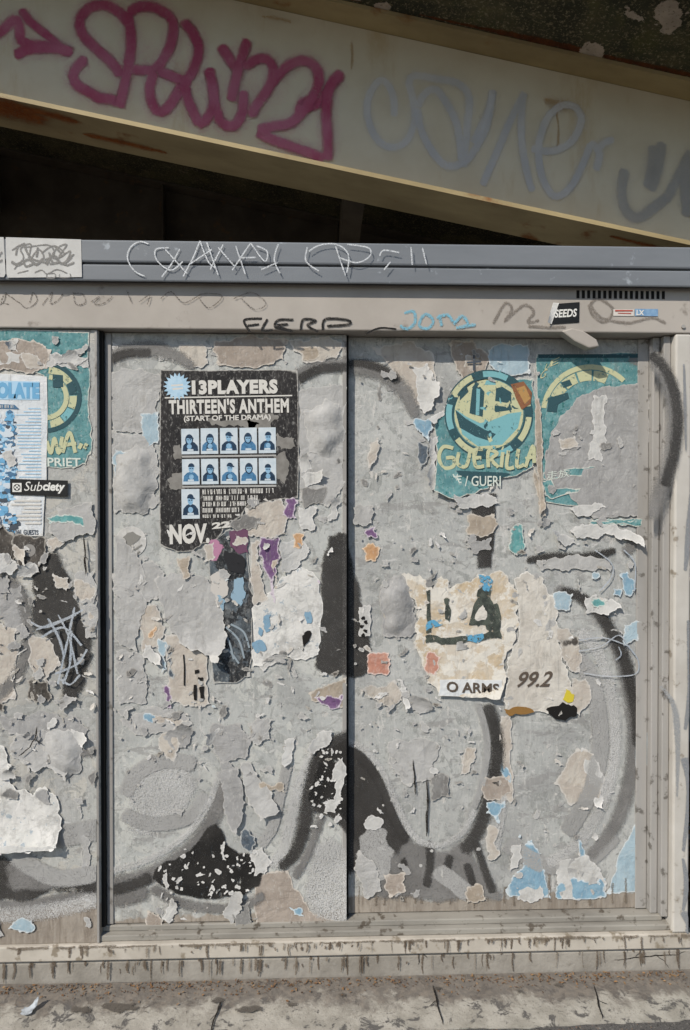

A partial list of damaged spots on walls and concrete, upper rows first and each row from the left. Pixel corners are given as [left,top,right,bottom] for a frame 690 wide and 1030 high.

spalling [624,0,689,35]
peeling [111,334,343,509]
peeling [224,383,402,630]
peeling [360,341,447,491]
peeling [448,340,540,384]
peeling [449,383,649,716]
peeling [0,501,98,805]
peeling [112,534,339,931]
peeling [298,670,347,828]
peeling [351,504,639,903]
peeling [0,917,35,937]
crack [431,987,443,1023]